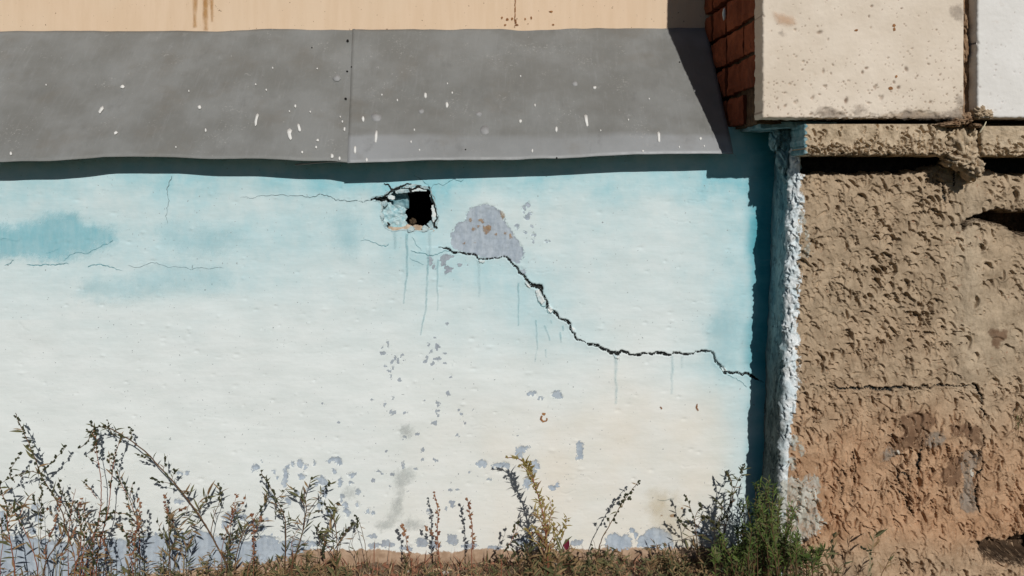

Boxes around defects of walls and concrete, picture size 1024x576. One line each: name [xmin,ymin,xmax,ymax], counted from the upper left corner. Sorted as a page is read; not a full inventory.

spalling [371,183,439,232]
peeling [427,202,551,274]
spalling [960,207,1024,236]
crack [361,237,761,386]
peeling [527,390,563,400]
peeling [267,456,375,517]
peeling [468,435,540,490]
peeling [575,441,584,460]
crack [816,382,985,516]
peeling [366,533,503,551]
peeling [605,527,674,552]
spalling [976,533,1024,565]